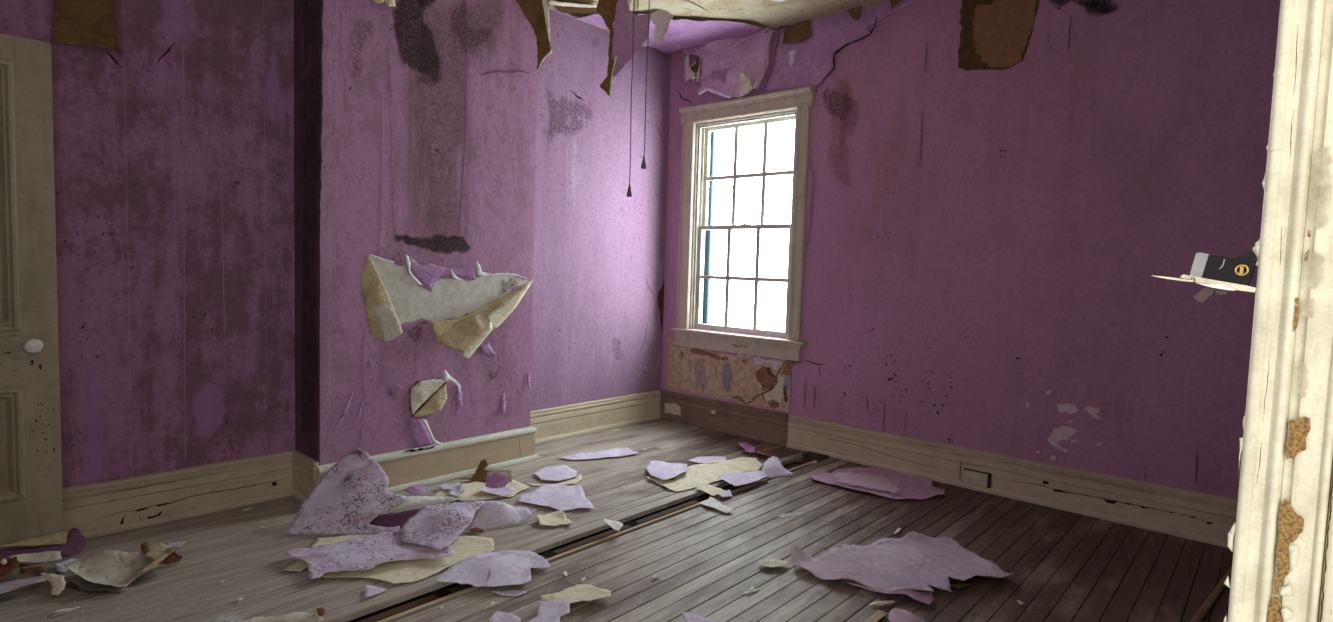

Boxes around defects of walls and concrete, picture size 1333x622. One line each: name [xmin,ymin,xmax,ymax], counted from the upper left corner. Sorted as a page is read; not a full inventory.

flaking render [549,1,597,14]
crack [815,17,877,93]
water stain [340,0,531,266]
water stain [265,0,324,441]
flaking render [657,281,803,412]
peeling [1267,498,1304,622]